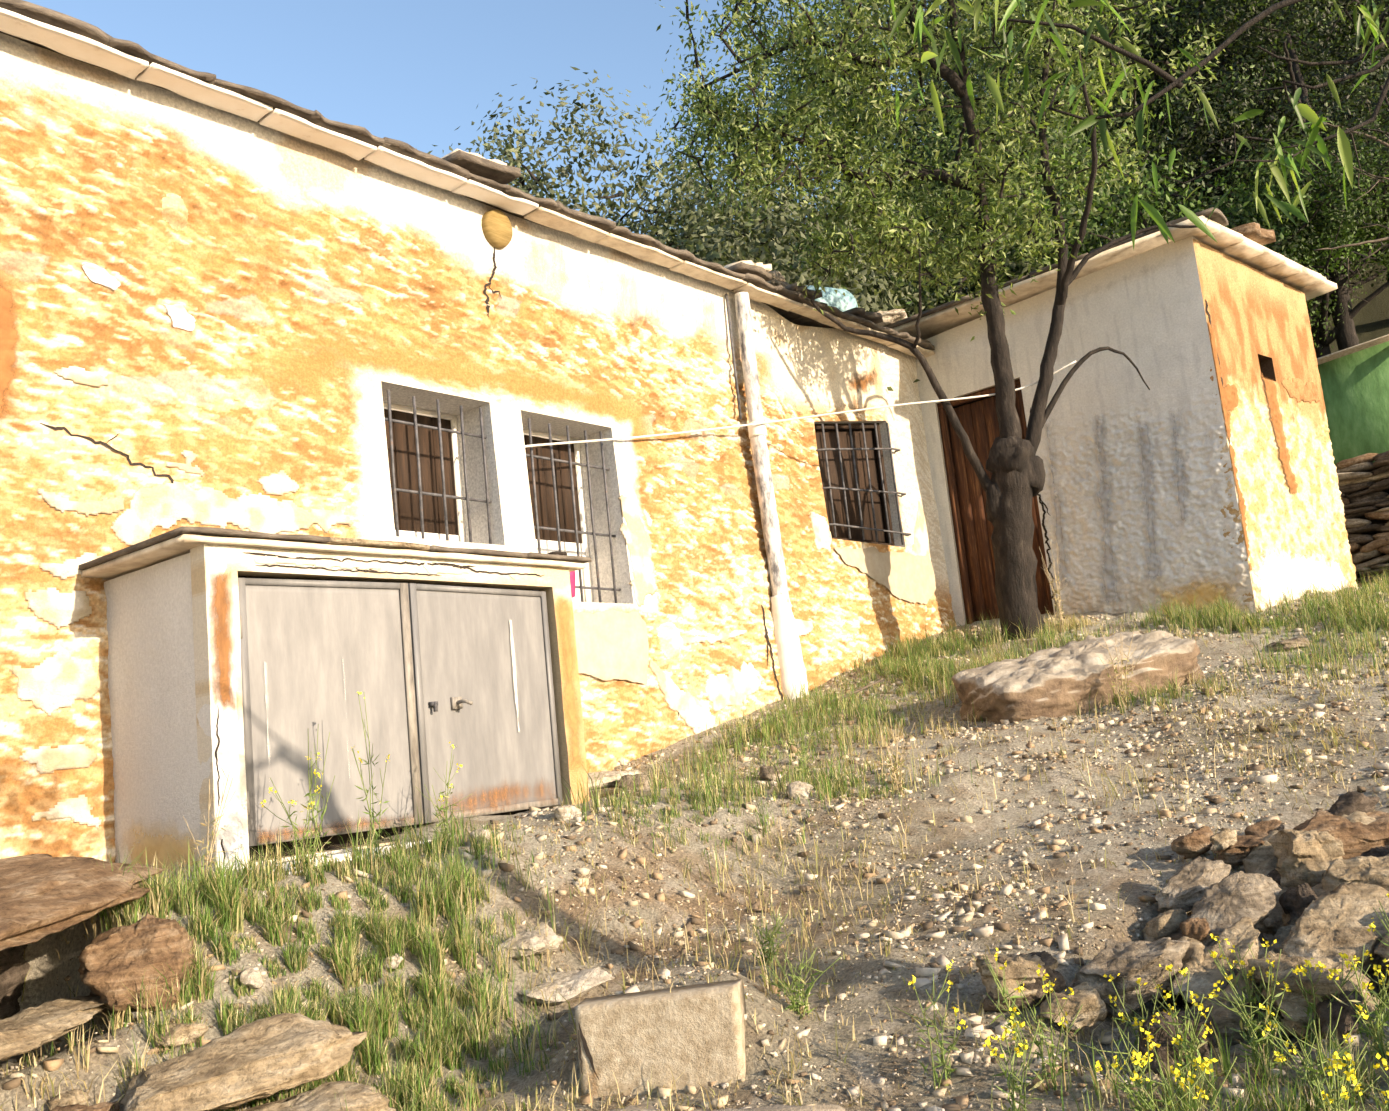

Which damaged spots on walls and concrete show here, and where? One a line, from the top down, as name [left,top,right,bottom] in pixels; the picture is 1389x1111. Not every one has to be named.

crack [41,423,174,483]
spalling [1208,322,1252,571]
flaking render [24,552,102,629]
flaking render [37,450,354,545]
crack [243,552,544,580]
flaking render [618,494,658,607]
flaking render [809,512,832,551]
rust [211,574,235,708]
flaking render [9,652,101,716]
flaking render [649,659,761,734]
crack [215,708,227,806]
flaking render [31,794,102,828]